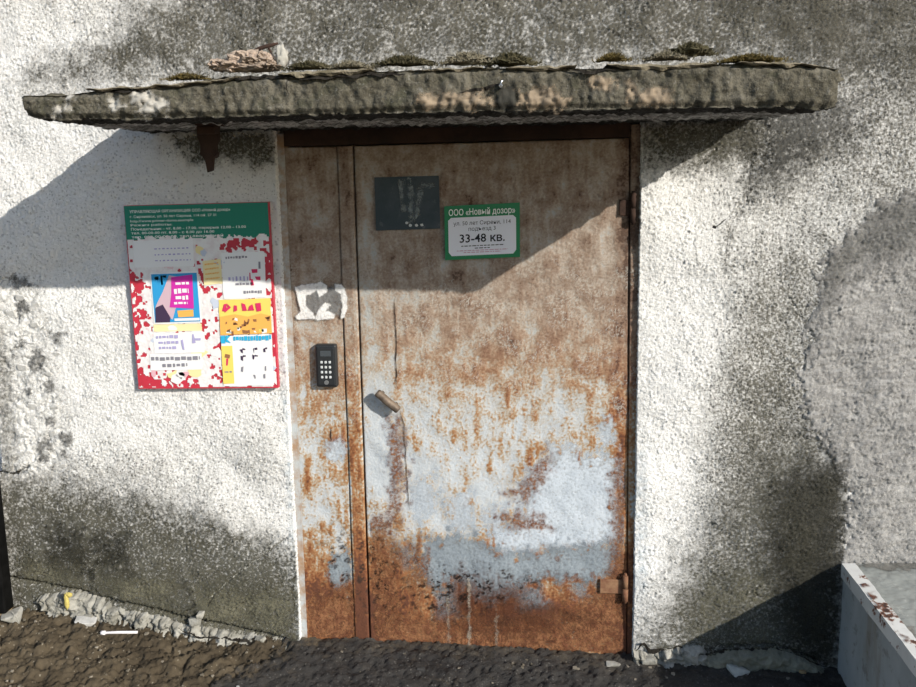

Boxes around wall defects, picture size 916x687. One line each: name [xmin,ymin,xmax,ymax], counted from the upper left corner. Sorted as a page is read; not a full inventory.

damp [0,471,300,641]
spalling [36,589,288,650]
corrosion [309,538,355,638]
corrosion [370,413,625,653]
spalling [633,643,708,669]
damp [638,425,847,668]